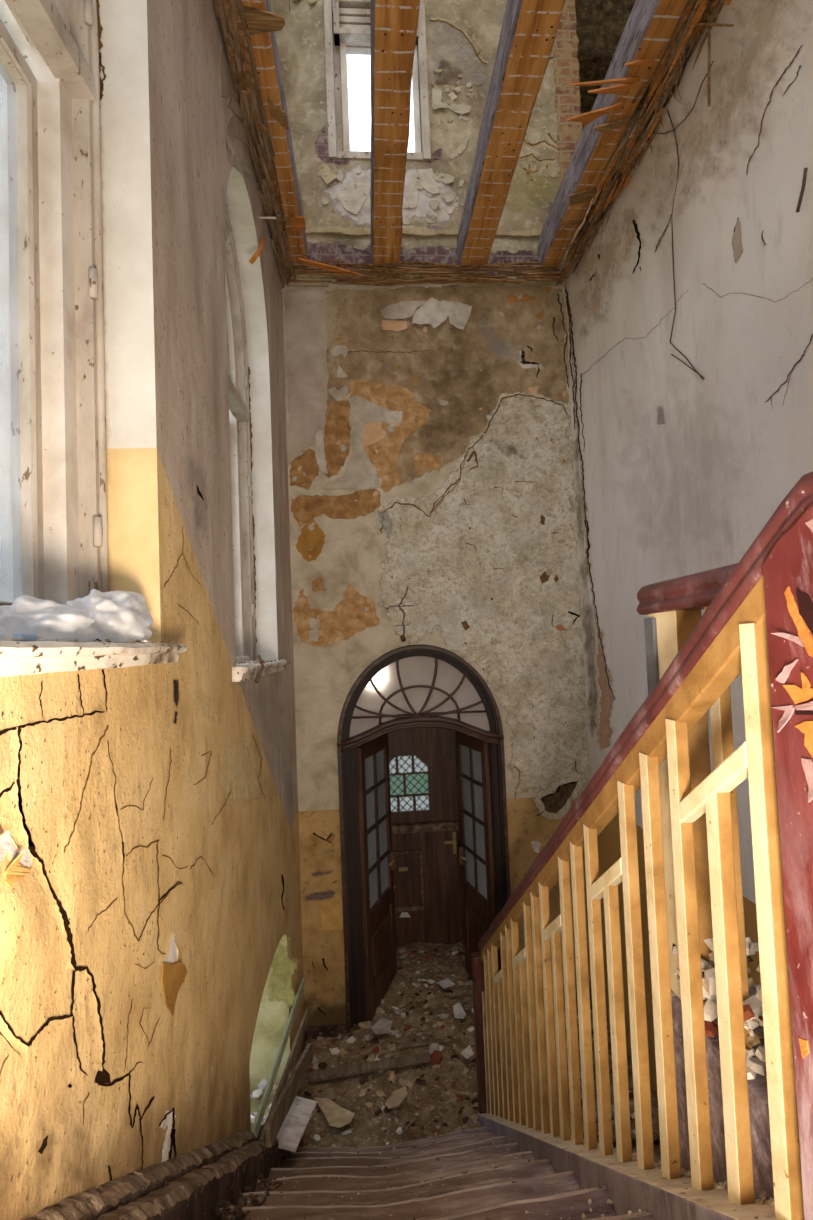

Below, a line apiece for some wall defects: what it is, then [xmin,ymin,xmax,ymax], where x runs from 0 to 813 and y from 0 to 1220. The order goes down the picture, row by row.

crack [746,45,803,173]
flaking render [213,0,732,496]
crack [632,214,672,274]
peeling [732,218,743,263]
flaking render [540,568,559,583]
flaking render [0,825,33,886]
crack [0,670,266,1170]
flaking render [157,930,188,1016]